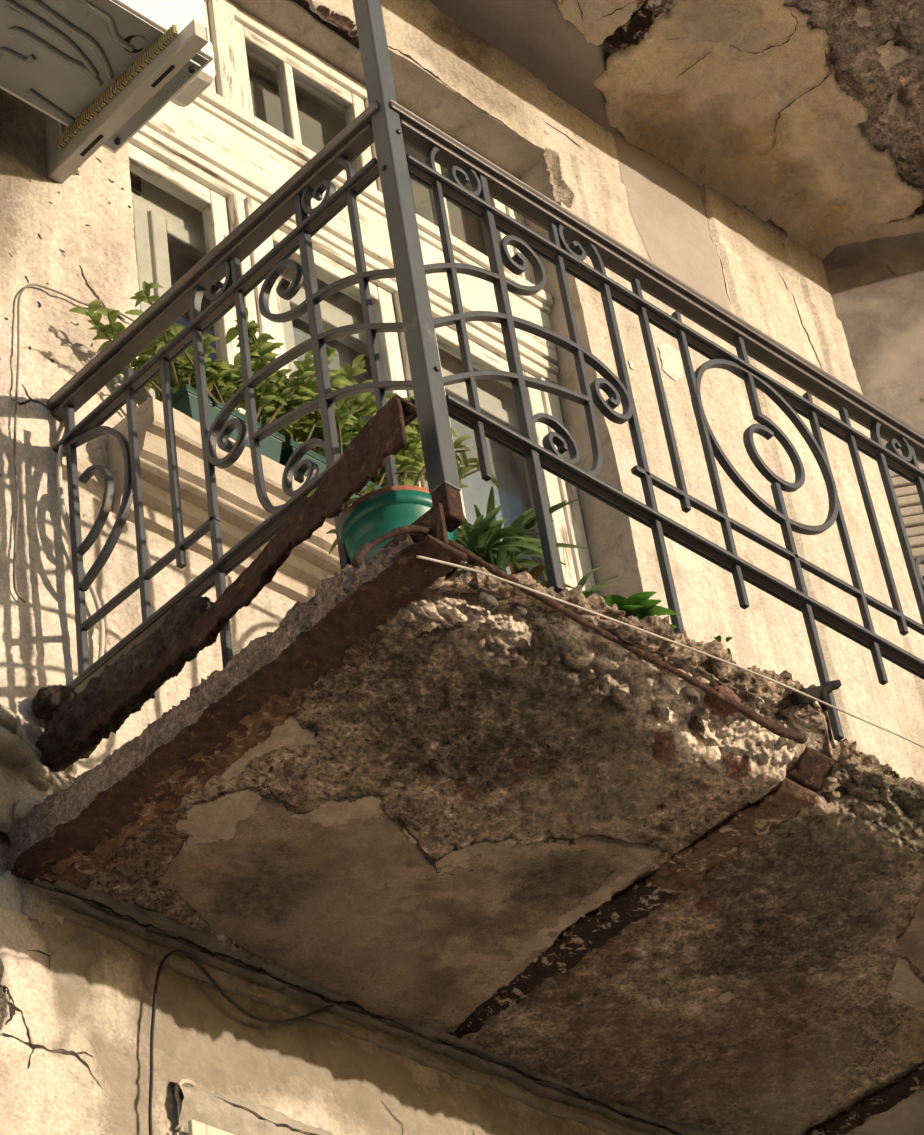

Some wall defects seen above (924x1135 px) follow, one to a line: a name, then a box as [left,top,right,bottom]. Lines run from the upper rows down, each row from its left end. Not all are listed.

crack [577,0,640,21]
crack [669,9,798,76]
crack [753,48,861,163]
spalling [544,147,574,208]
spalling [351,525,432,567]
spalling [448,539,807,747]
spalling [652,730,678,766]
spalling [720,752,751,782]
crack [0,985,103,1089]